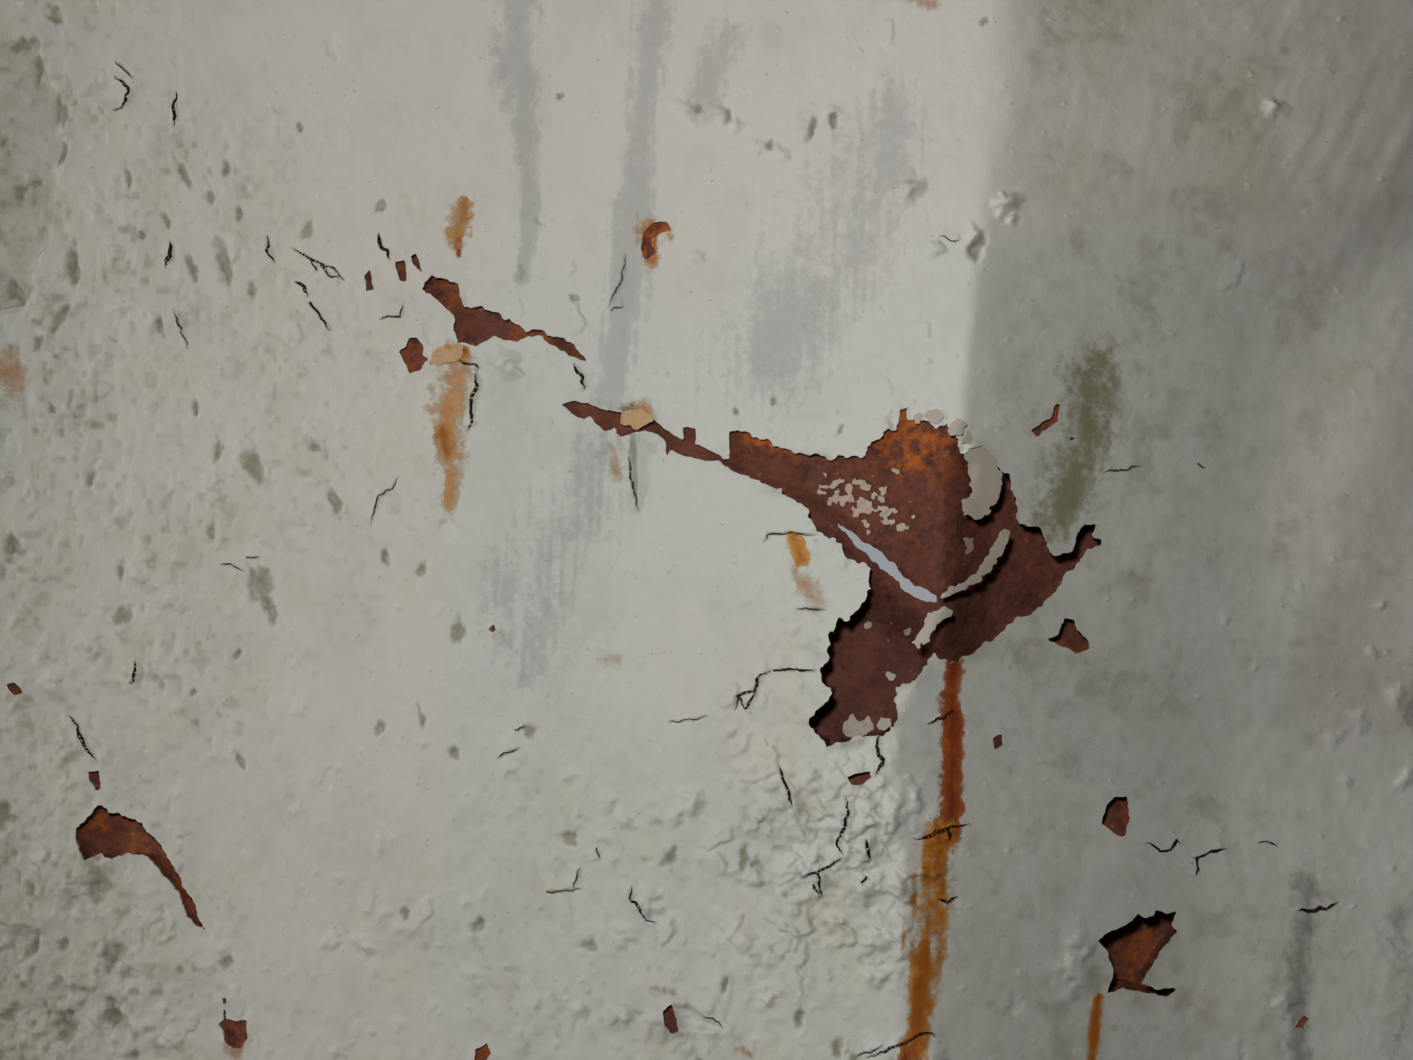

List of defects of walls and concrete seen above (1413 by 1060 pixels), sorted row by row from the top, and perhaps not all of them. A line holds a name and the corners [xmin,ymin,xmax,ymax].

corrosion [446,196,473,257]
peeling [400,338,464,373]
corrosion [427,344,472,512]
peeling [913,409,1003,520]
peeling [817,468,915,535]
peeling [904,529,1010,649]
peeling [1048,618,1089,654]
crack [669,668,814,723]
peeling [1102,797,1129,836]
corrosion [898,658,965,1060]
peeling [220,998,248,1048]
corrosion [1087,993,1103,1060]